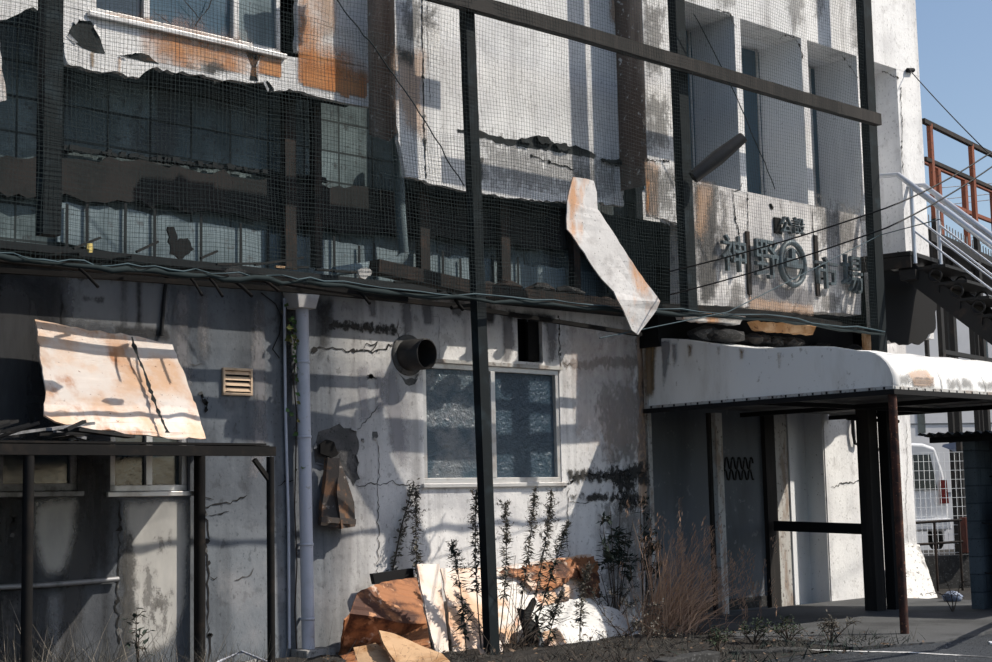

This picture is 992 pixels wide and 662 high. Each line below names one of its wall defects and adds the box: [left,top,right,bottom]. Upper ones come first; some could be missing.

corrosion [159,35,238,73]
spalling [245,51,274,91]
corrosion [259,56,282,77]
corrosion [298,0,369,98]
peeling [519,135,571,151]
corrosion [910,369,933,386]
spalling [313,424,378,485]
crack [309,321,416,573]
damp [568,461,650,513]
damp [36,458,113,662]
crack [114,501,123,645]
damp [119,499,189,660]